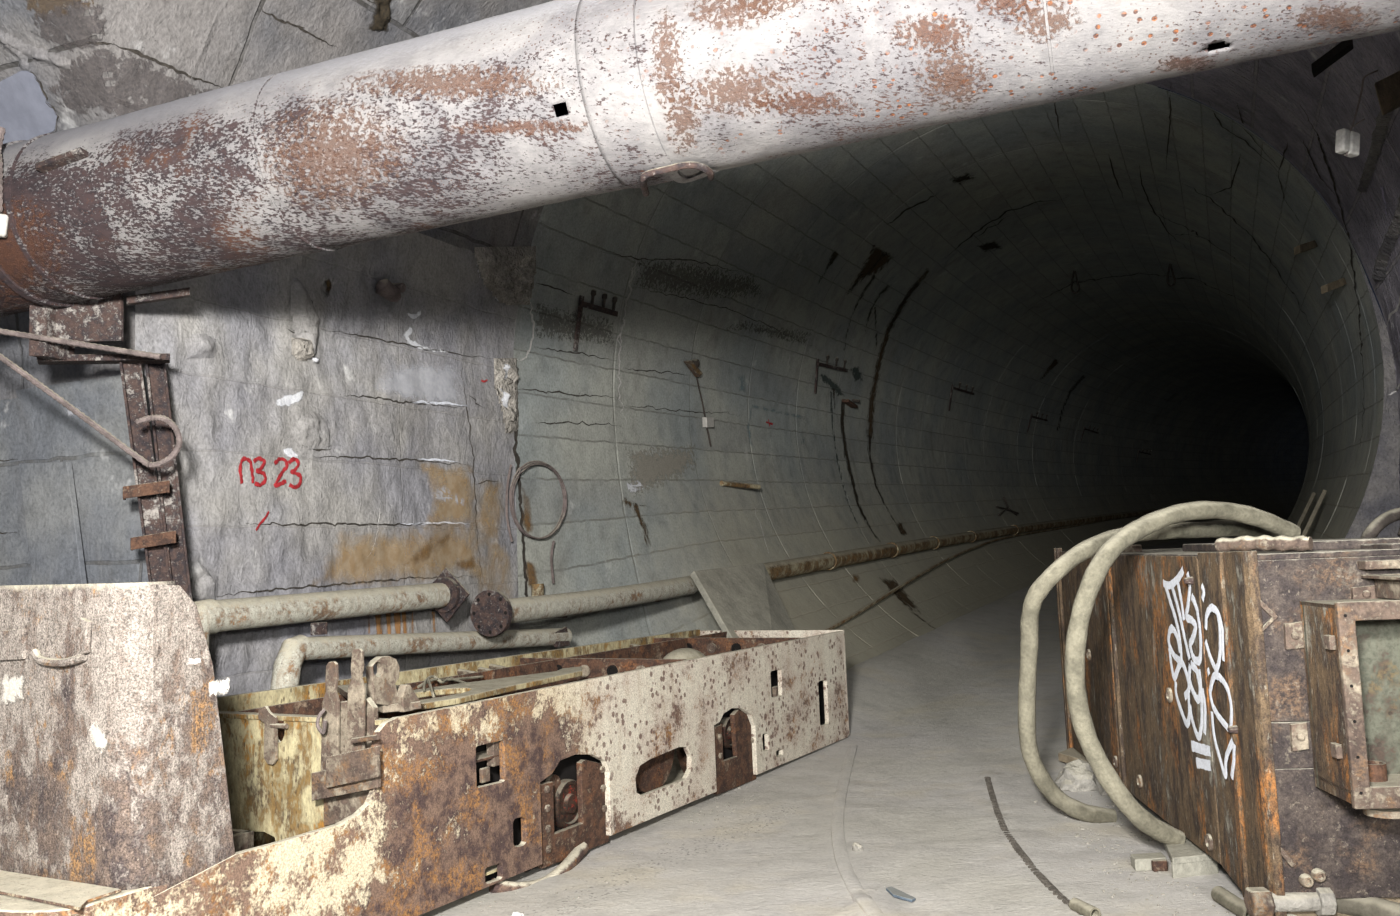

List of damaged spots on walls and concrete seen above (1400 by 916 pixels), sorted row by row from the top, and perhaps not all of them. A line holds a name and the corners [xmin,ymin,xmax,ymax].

rust [332,467,477,579]